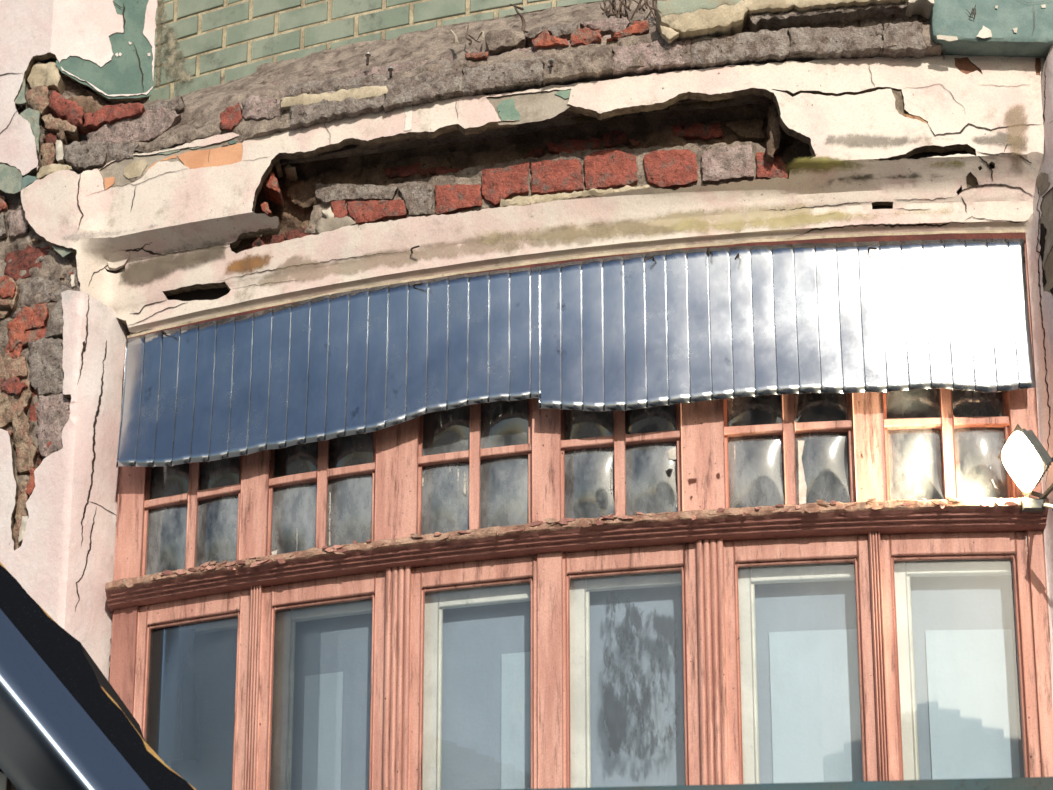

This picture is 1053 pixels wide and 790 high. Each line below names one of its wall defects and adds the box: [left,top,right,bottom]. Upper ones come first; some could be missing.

peeling [966,5,992,38]
flaking render [1036,172,1053,296]
crack [219,251,406,287]
flaking render [0,0,964,550]
crack [764,68,1052,484]
crack [75,242,230,611]
peeling [980,498,1025,508]
peeling [322,539,388,555]
peeling [153,552,298,580]